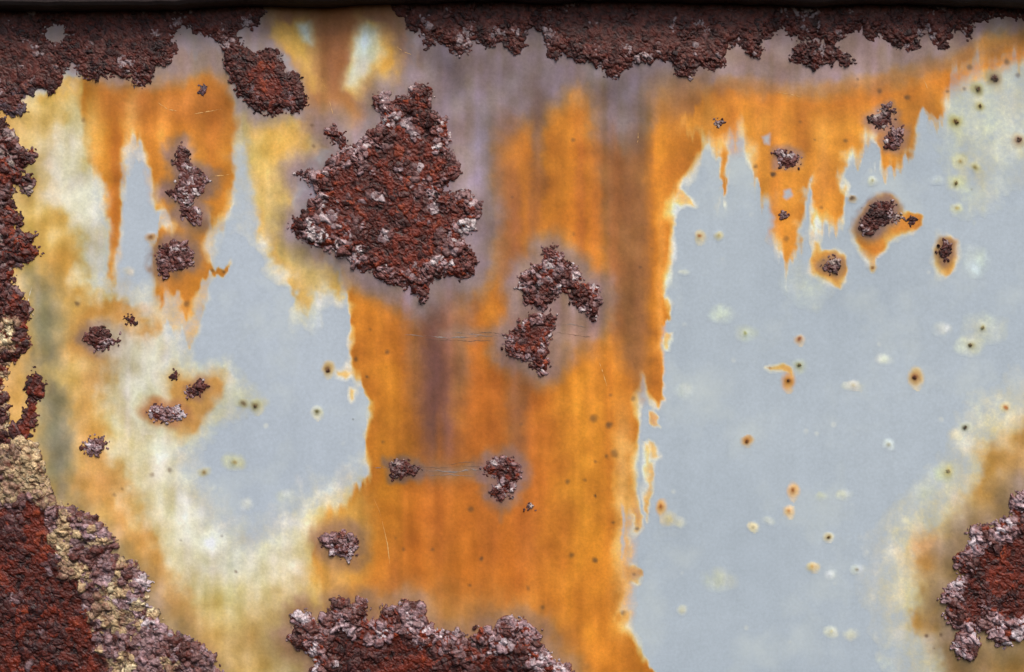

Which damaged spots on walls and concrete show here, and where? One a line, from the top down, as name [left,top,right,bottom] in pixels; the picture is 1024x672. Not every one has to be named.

corrosion [220,35,309,118]
corrosion [770,148,800,170]
corrosion [788,40,853,72]
corrosion [867,101,897,130]
corrosion [883,125,905,151]
corrosion [987,72,1003,86]
corrosion [0,6,271,453]
corrosion [778,237,850,314]
corrosion [847,189,926,274]
corrosion [928,227,963,282]
corrosion [0,435,224,672]
corrosion [848,364,1024,672]